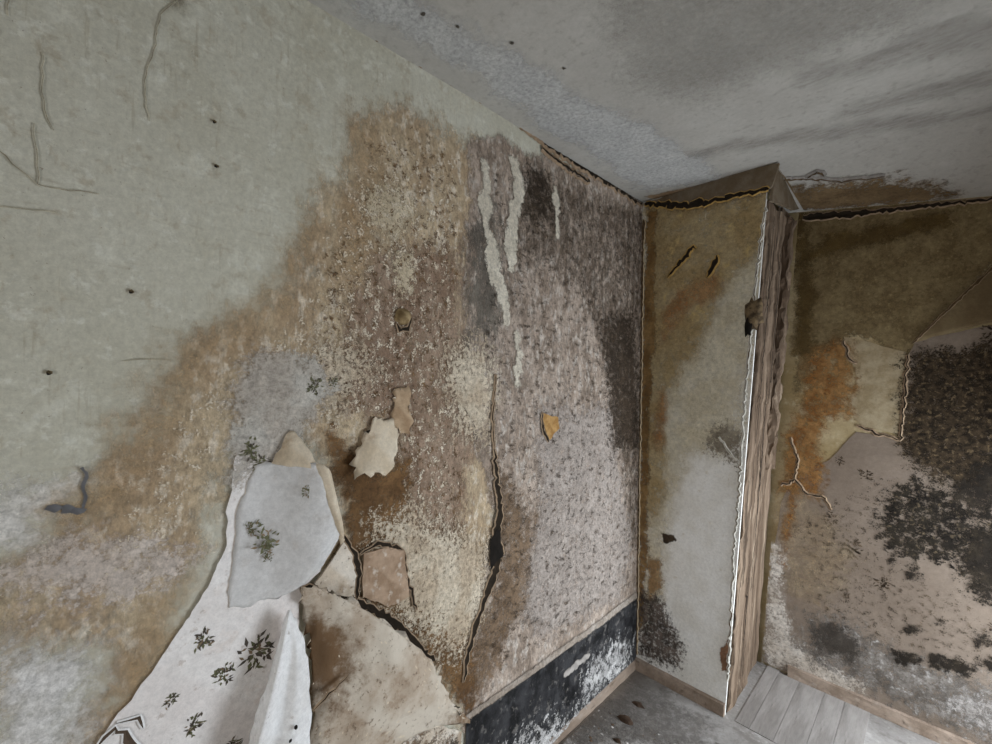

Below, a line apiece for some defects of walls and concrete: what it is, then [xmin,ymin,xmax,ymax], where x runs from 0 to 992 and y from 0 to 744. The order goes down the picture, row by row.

crack [144,0,179,121]
peeling [249,542,470,744]
crack [300,535,436,662]
peeling [349,385,414,480]
leakage [0,103,766,744]
crack [462,374,505,683]
corrosion [779,339,858,602]
leakage [763,171,992,743]